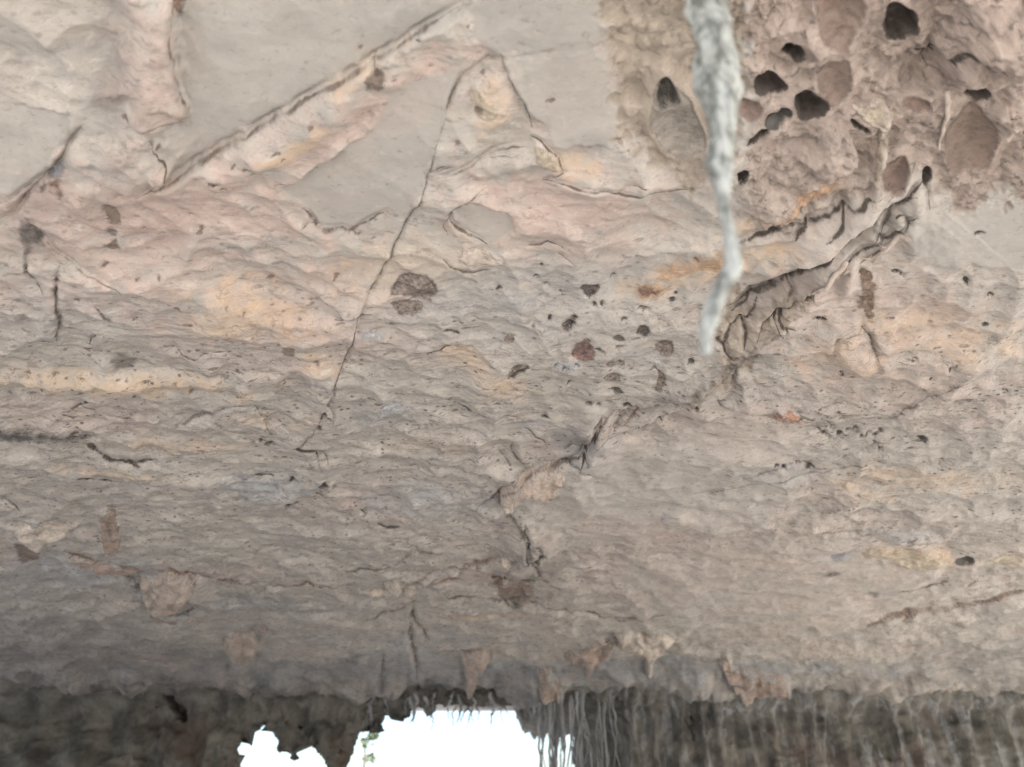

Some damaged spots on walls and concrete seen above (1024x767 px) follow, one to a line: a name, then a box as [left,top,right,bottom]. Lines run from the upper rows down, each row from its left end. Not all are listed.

crack [148,122,181,184]
crack [370,87,455,289]
crack [715,297,879,361]
crack [292,317,359,460]
crack [501,405,677,476]